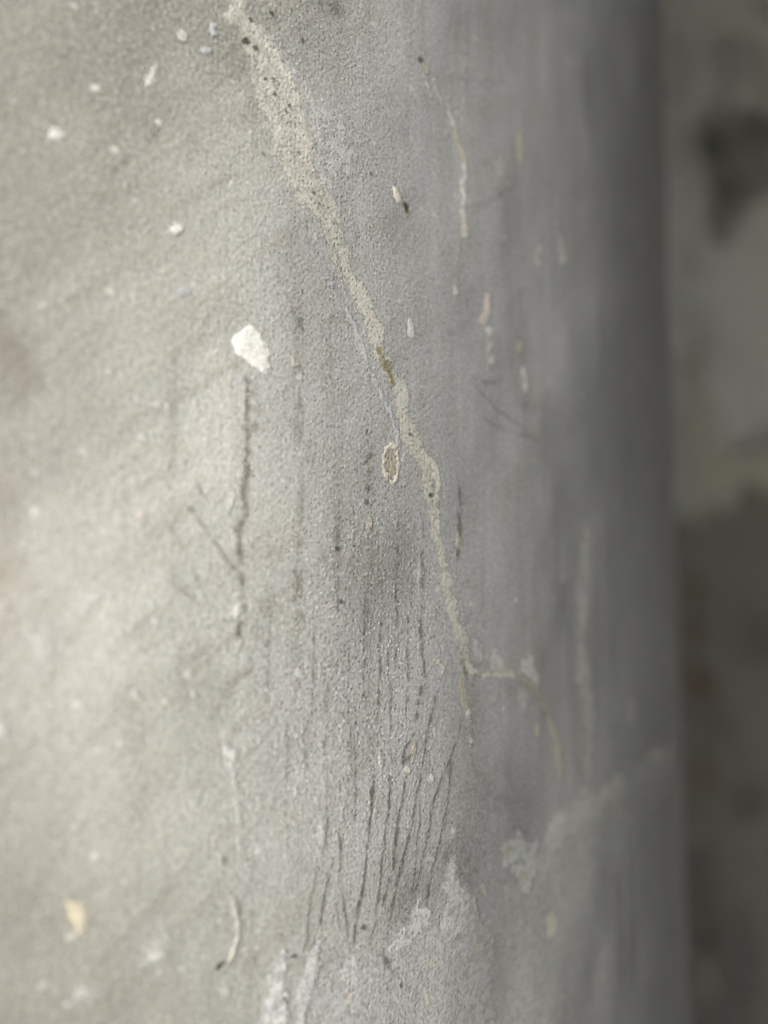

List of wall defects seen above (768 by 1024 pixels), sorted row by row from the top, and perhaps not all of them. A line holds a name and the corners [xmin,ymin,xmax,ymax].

peeling [230,324,270,374]
peeling [343,303,407,487]
crack [218,0,565,782]